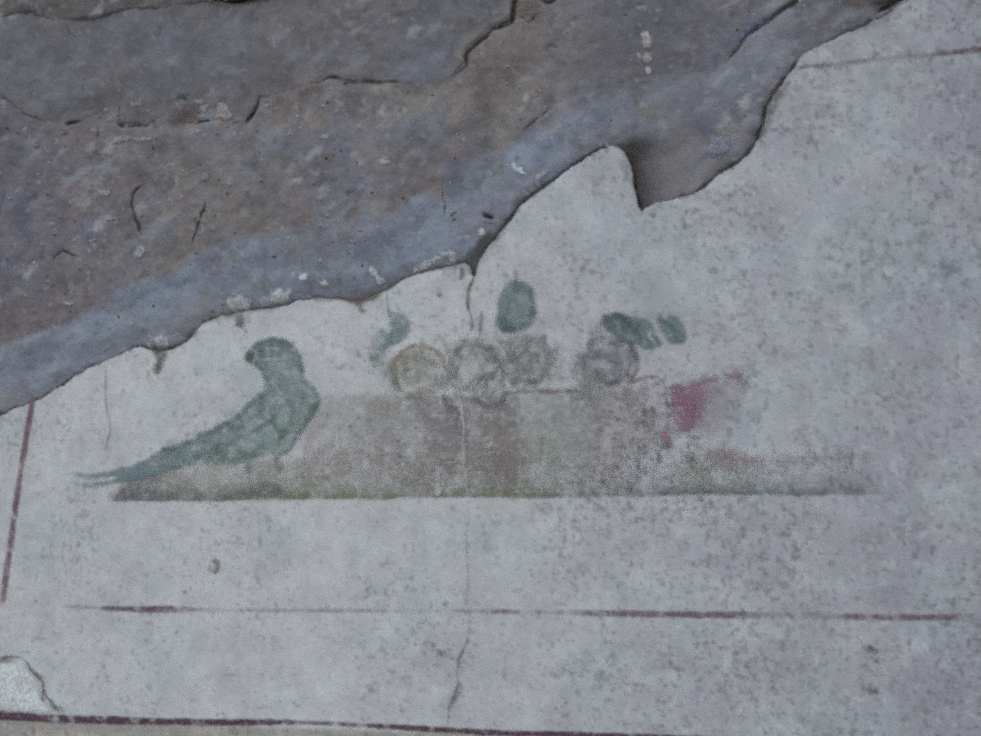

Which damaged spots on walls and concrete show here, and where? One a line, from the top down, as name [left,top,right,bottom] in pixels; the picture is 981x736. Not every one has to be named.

crack [455,0,555,76]
spalling [0,0,908,415]
crack [467,278,482,330]
crack [0,656,62,716]